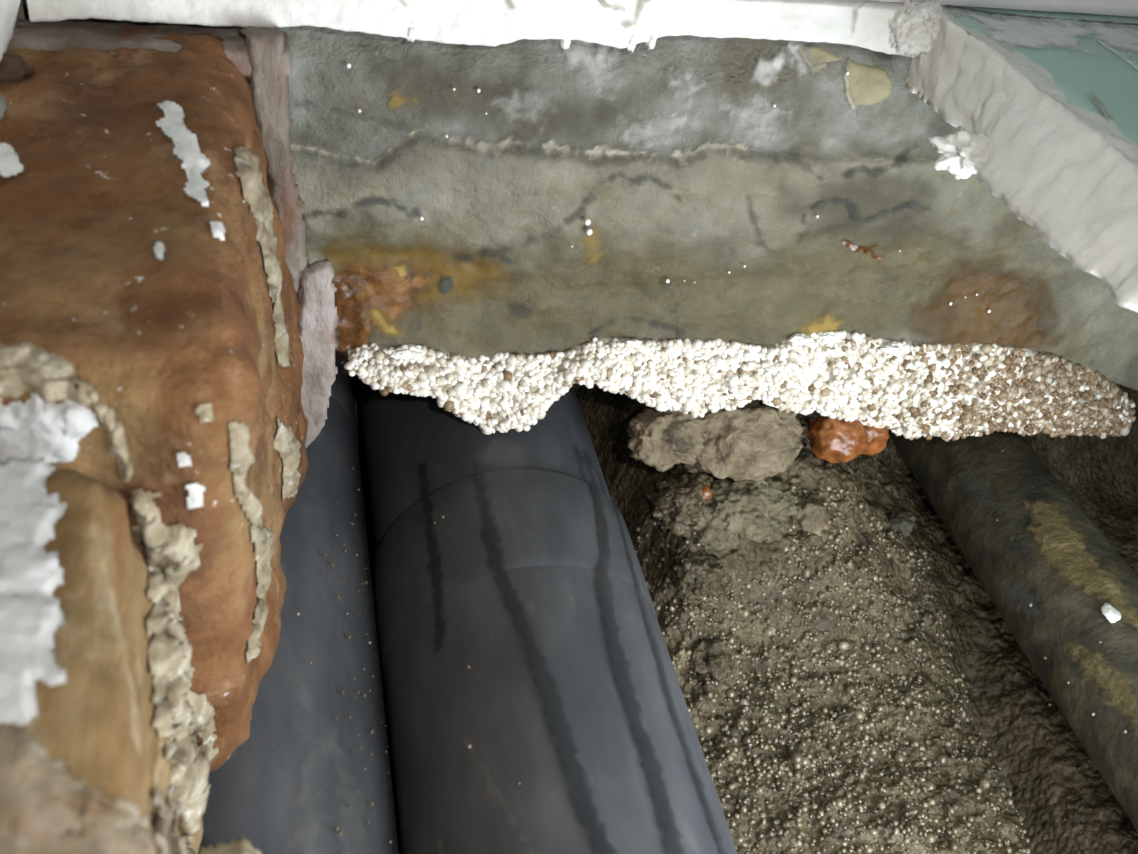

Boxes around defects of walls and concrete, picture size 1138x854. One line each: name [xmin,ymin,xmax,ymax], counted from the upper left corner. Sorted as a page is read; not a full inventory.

crack [302,198,420,221]
spalling [0,0,1138,312]
crack [611,176,679,199]
crack [803,150,925,224]
corrosion [330,250,495,363]
spalling [298,259,1136,448]